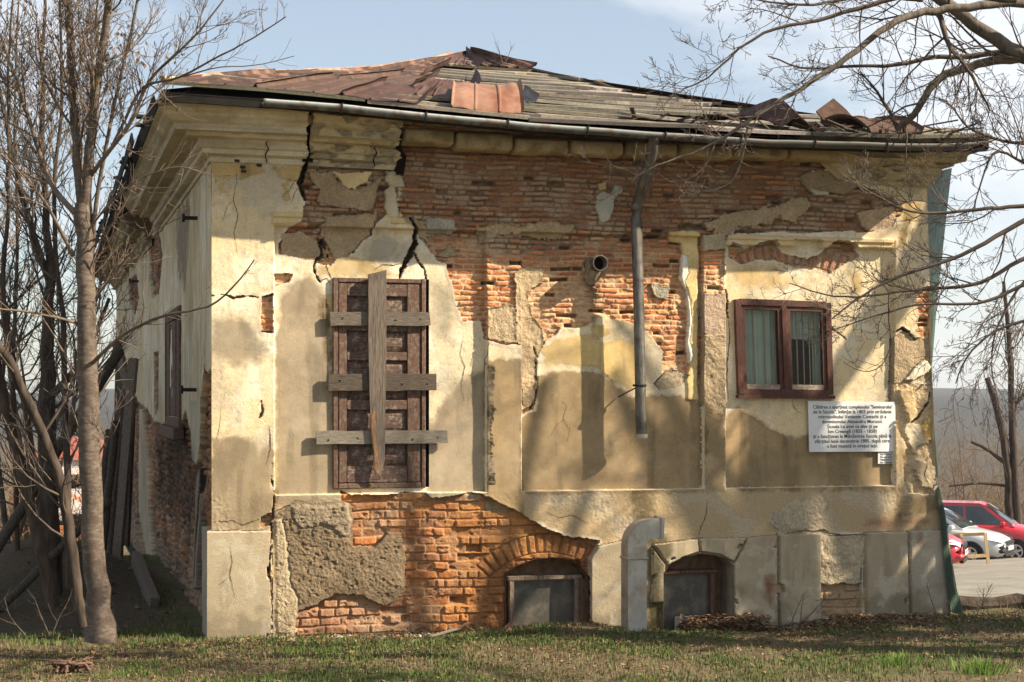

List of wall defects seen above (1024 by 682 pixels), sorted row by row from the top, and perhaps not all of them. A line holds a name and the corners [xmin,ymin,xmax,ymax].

crack [288,112,313,204]
crack [312,228,332,284]
crack [374,217,427,278]
spalling [212,121,920,419]
spalling [130,351,222,616]
crack [193,363,293,634]
spalling [295,490,600,636]
spalling [888,286,937,495]